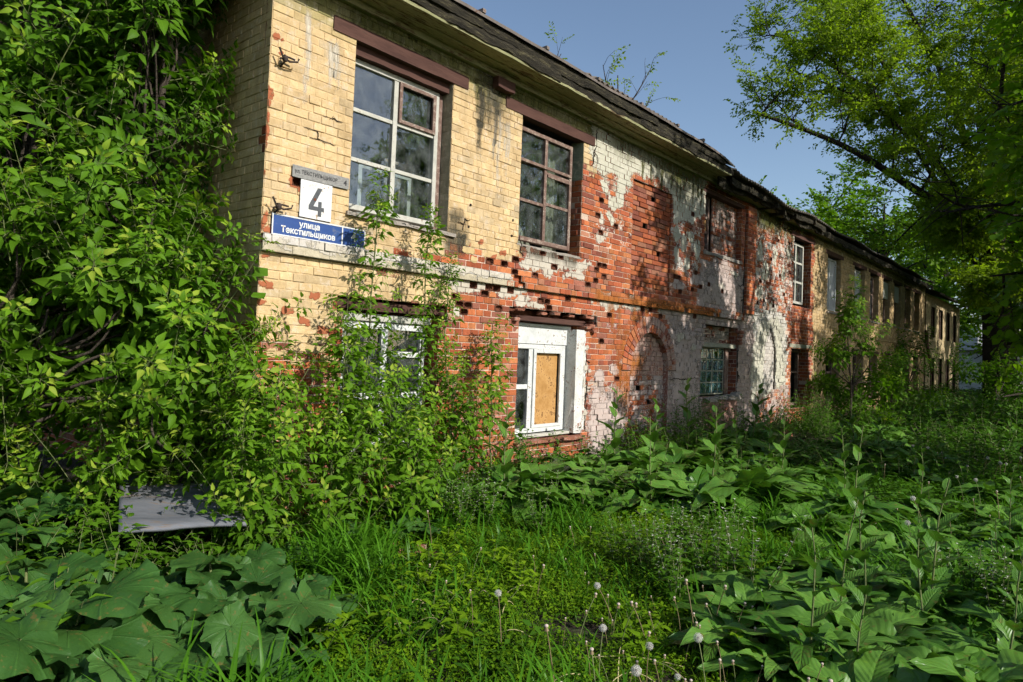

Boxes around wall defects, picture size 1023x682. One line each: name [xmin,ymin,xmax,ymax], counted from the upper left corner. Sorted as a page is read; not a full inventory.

peeling [265,86,274,148]
water stain [475,72,510,176]
spalling [289,175,302,192]
peeling [261,211,292,251]
peeling [257,280,274,306]
peeling [588,125,792,437]
peeling [266,306,339,365]
peeling [306,239,630,454]